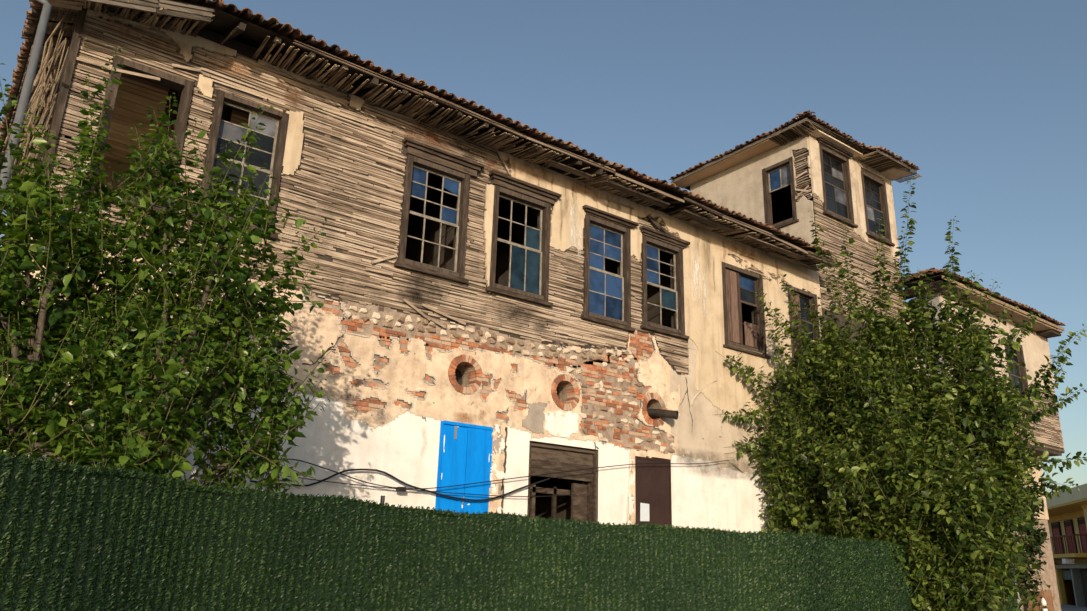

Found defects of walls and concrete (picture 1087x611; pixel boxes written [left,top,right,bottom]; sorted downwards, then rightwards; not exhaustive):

spalling [299,289,760,525]